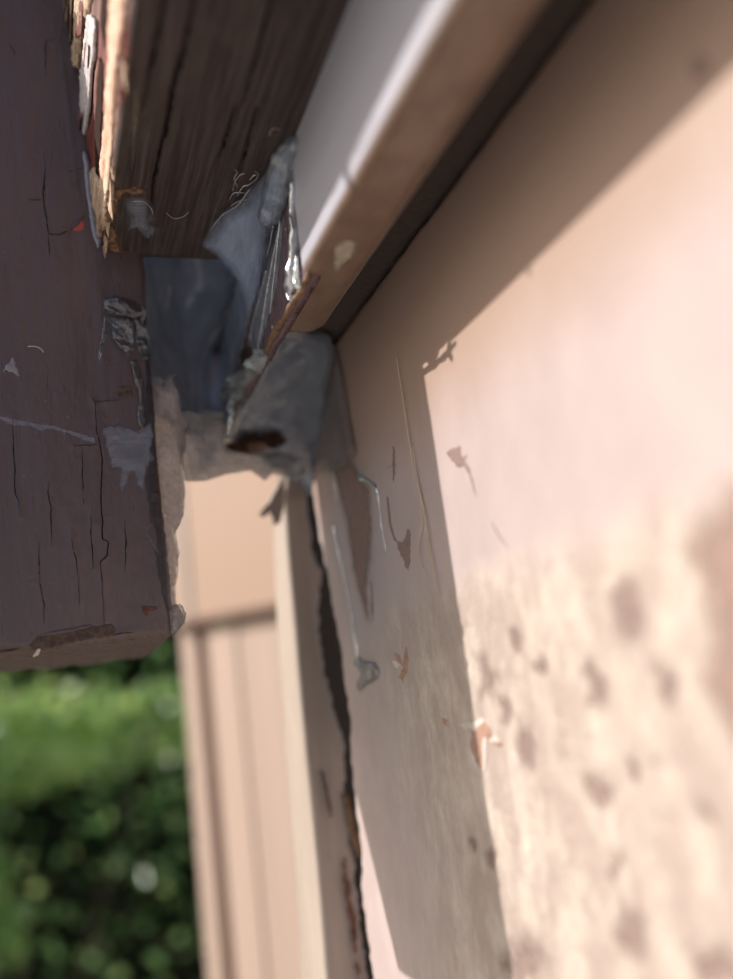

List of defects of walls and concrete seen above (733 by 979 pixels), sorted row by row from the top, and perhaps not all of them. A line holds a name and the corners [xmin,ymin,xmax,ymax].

peeling [58,0,110,249]
peeling [118,4,129,104]
crack [145,0,193,214]
crack [220,0,270,165]
crack [28,155,82,254]
crack [11,420,19,502]
peeling [447,445,470,474]
crack [38,399,127,624]
peeling [397,530,410,568]
peeling [442,718,502,777]
corrosion [342,857,361,979]